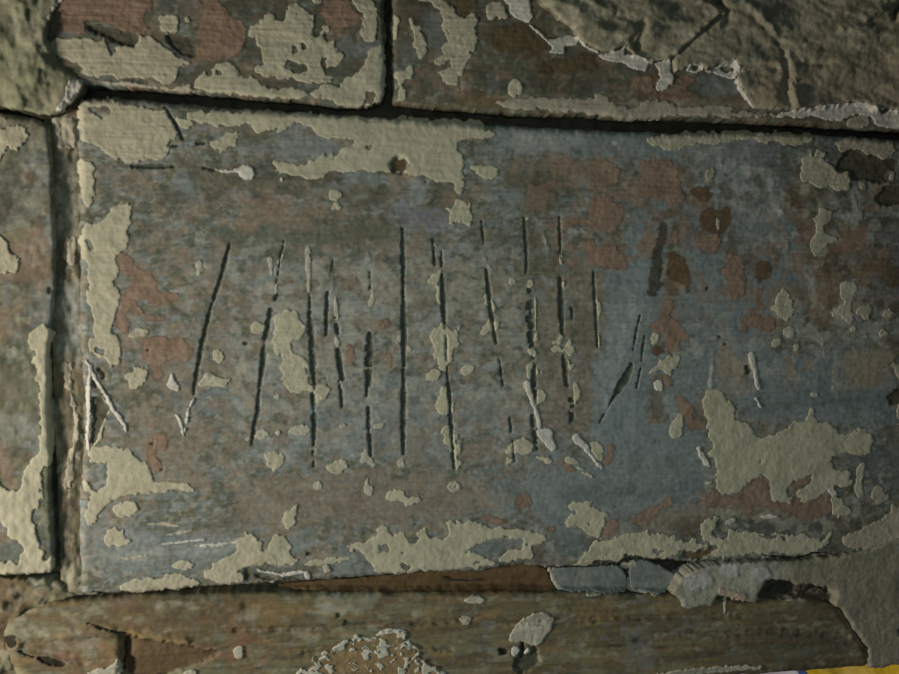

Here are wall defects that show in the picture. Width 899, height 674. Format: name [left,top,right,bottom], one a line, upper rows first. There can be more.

peeling [0,114,29,161]
peeling [51,0,508,227]
peeling [495,78,777,121]
peeling [647,115,899,217]
peeling [0,203,195,575]
peeling [198,372,231,388]
peeling [243,309,330,403]
peeling [426,322,462,470]
peeling [524,279,543,389]
peeling [649,355,680,391]
peeling [831,281,872,332]
peeling [120,389,899,604]